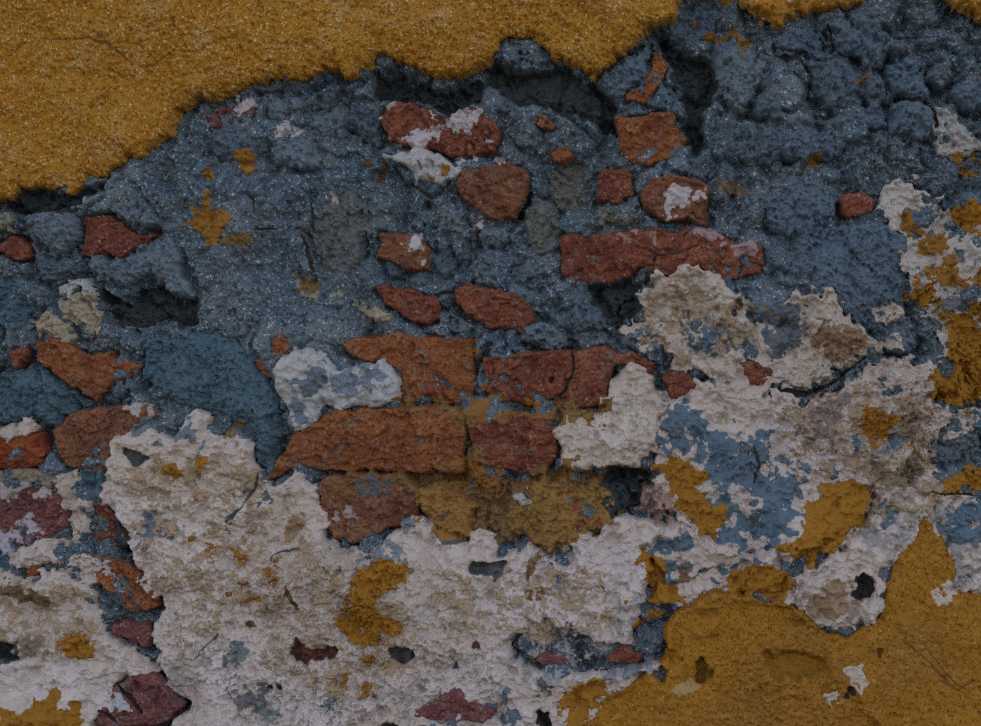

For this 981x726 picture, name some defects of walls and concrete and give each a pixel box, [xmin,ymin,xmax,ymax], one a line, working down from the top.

peeling [704,27,754,58]
peeling [232,148,258,175]
peeling [381,150,463,188]
peeling [799,151,822,173]
peeling [931,107,981,179]
peeling [0,169,981,726]